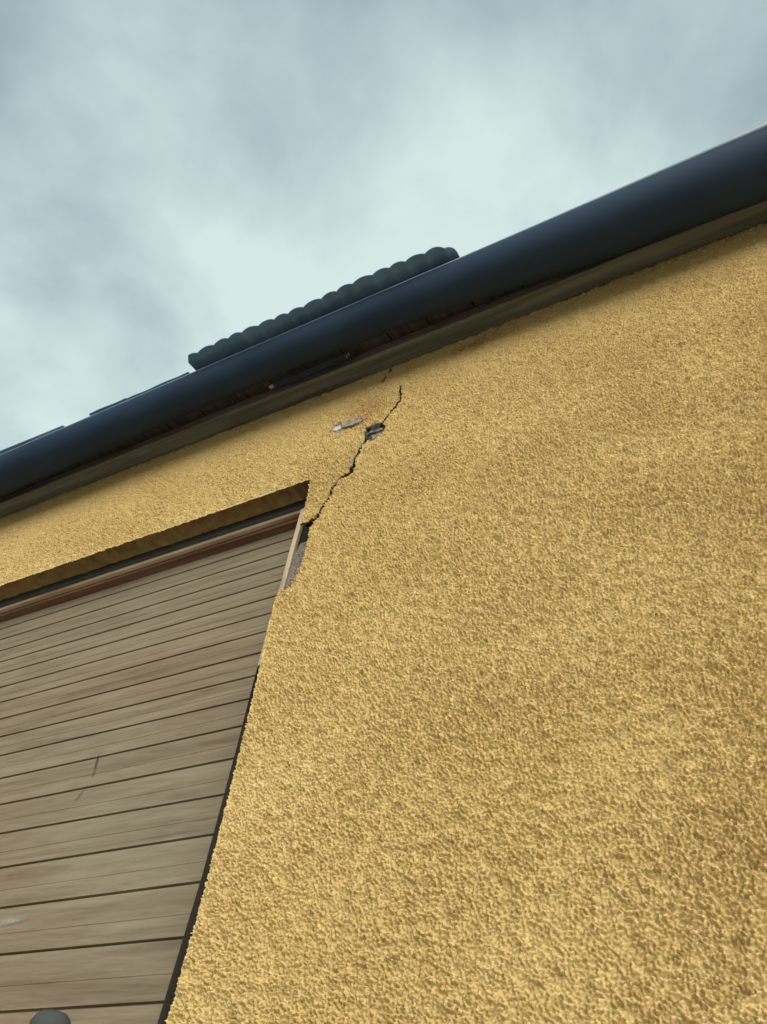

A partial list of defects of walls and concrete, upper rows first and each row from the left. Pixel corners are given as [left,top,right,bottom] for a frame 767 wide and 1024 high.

crack [316,369,402,518]